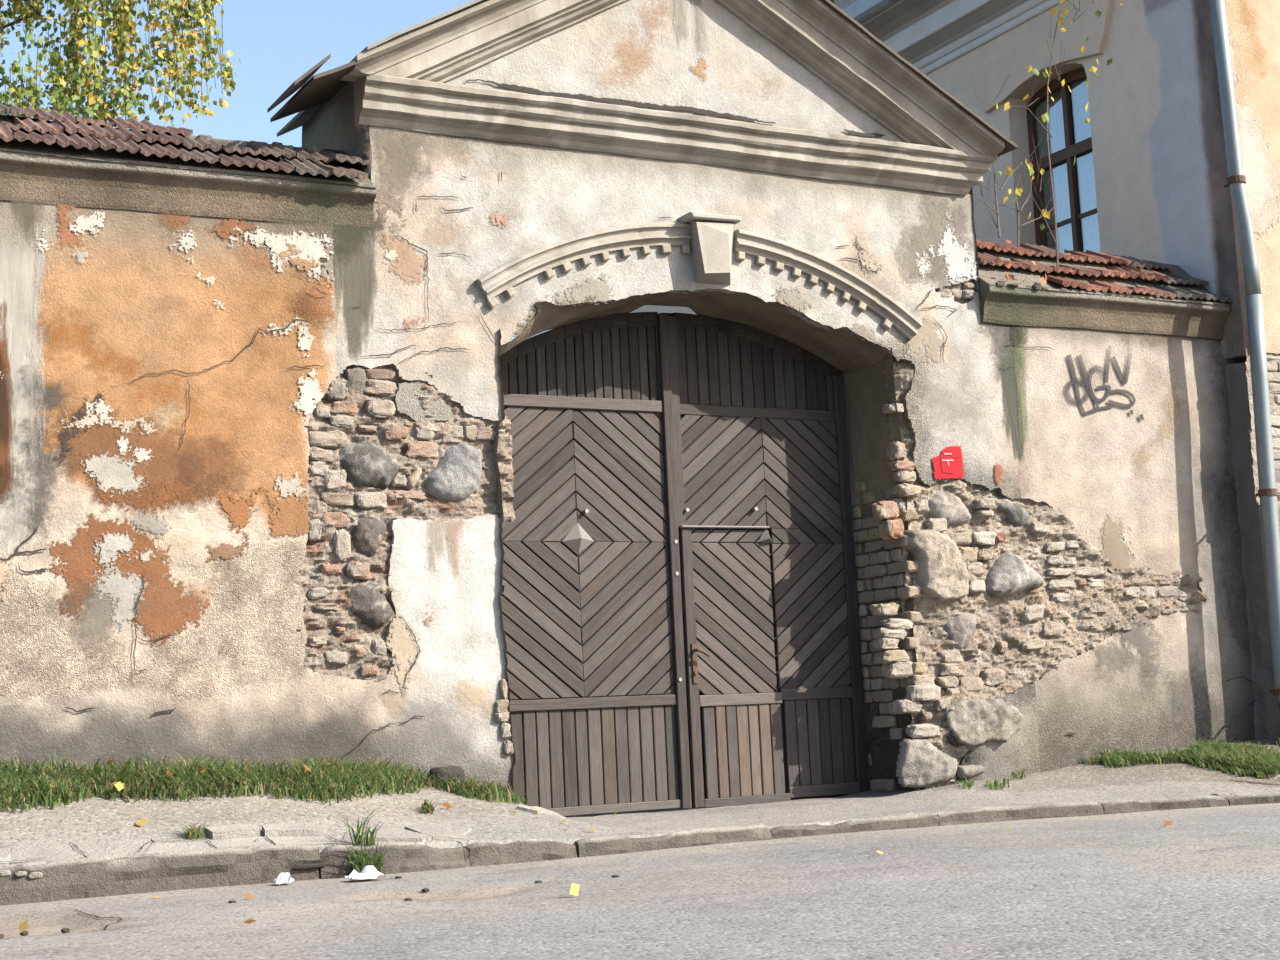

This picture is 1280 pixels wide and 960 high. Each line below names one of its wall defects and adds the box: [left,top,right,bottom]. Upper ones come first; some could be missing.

crack [465,79,775,124]
peeling [66,209,106,264]
leakage [0,201,238,558]
peeling [228,226,335,287]
crack [115,176,498,450]
flaking render [773,286,812,316]
leakage [989,324,1026,442]
spalling [1245,348,1260,505]
spalling [1266,353,1280,501]
flaking render [57,394,177,632]
spalling [206,317,515,708]
spalling [847,314,1209,791]